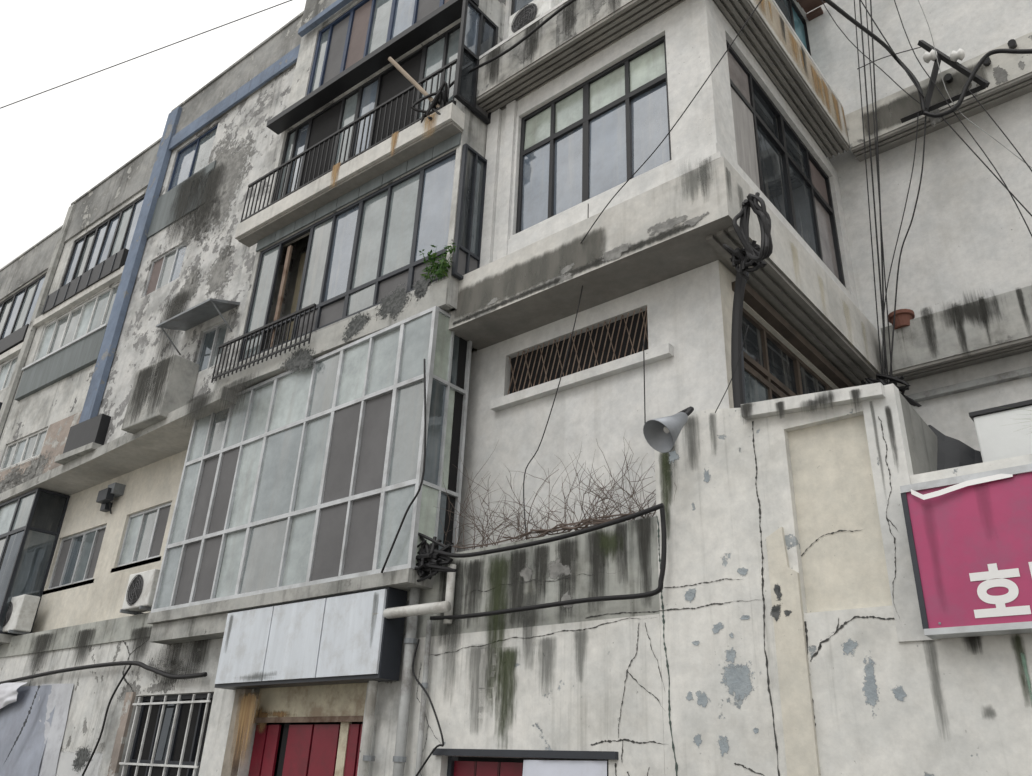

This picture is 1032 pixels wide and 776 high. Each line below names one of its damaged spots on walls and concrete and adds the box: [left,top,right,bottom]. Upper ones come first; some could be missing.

corrosion [789,32,847,132]
peeling [176,131,256,302]
leakage [130,291,189,422]
leakage [921,295,999,350]
leakage [661,446,675,527]
crack [804,416,900,662]
leakage [439,514,651,735]
crack [417,421,780,776]
peeling [712,622,755,703]
spalling [770,583,792,622]
peeling [841,639,878,716]
leakage [1012,634,1032,700]